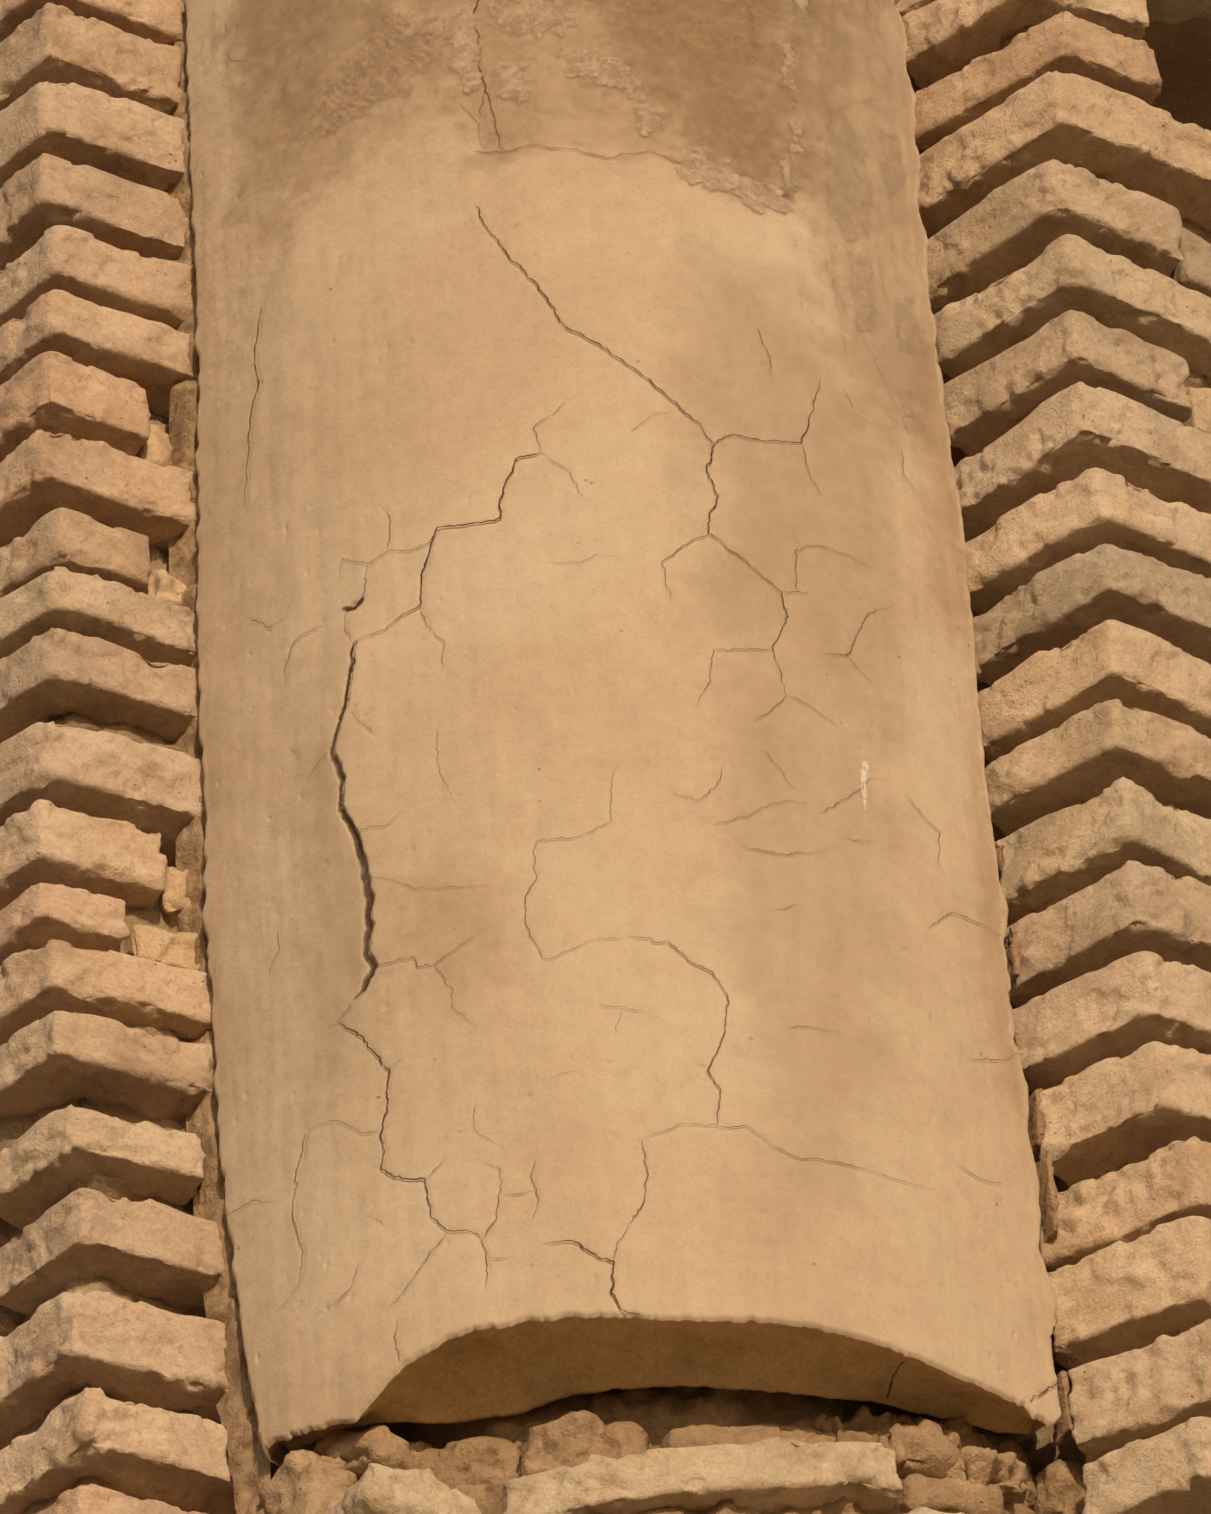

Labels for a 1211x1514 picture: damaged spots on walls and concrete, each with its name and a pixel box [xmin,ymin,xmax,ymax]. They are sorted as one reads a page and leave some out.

crack [461,0,719,180]
water stain [468,0,843,189]
crack [244,309,262,503]
crack [477,207,879,721]
crack [233,400,943,1356]
crack [932,912,1002,936]